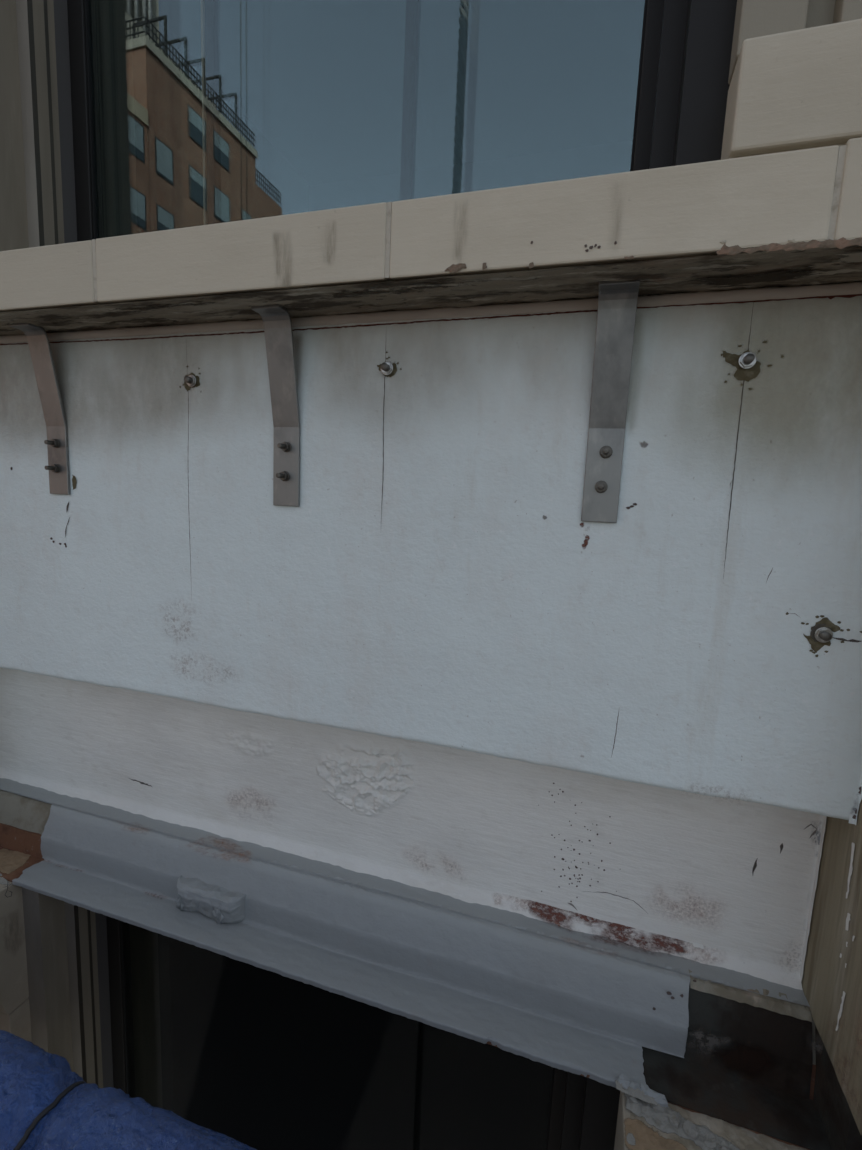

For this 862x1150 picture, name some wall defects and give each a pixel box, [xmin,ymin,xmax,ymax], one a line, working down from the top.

peeling [716,237,862,263]
peeling [333,263,488,298]
rust [524,901,704,953]